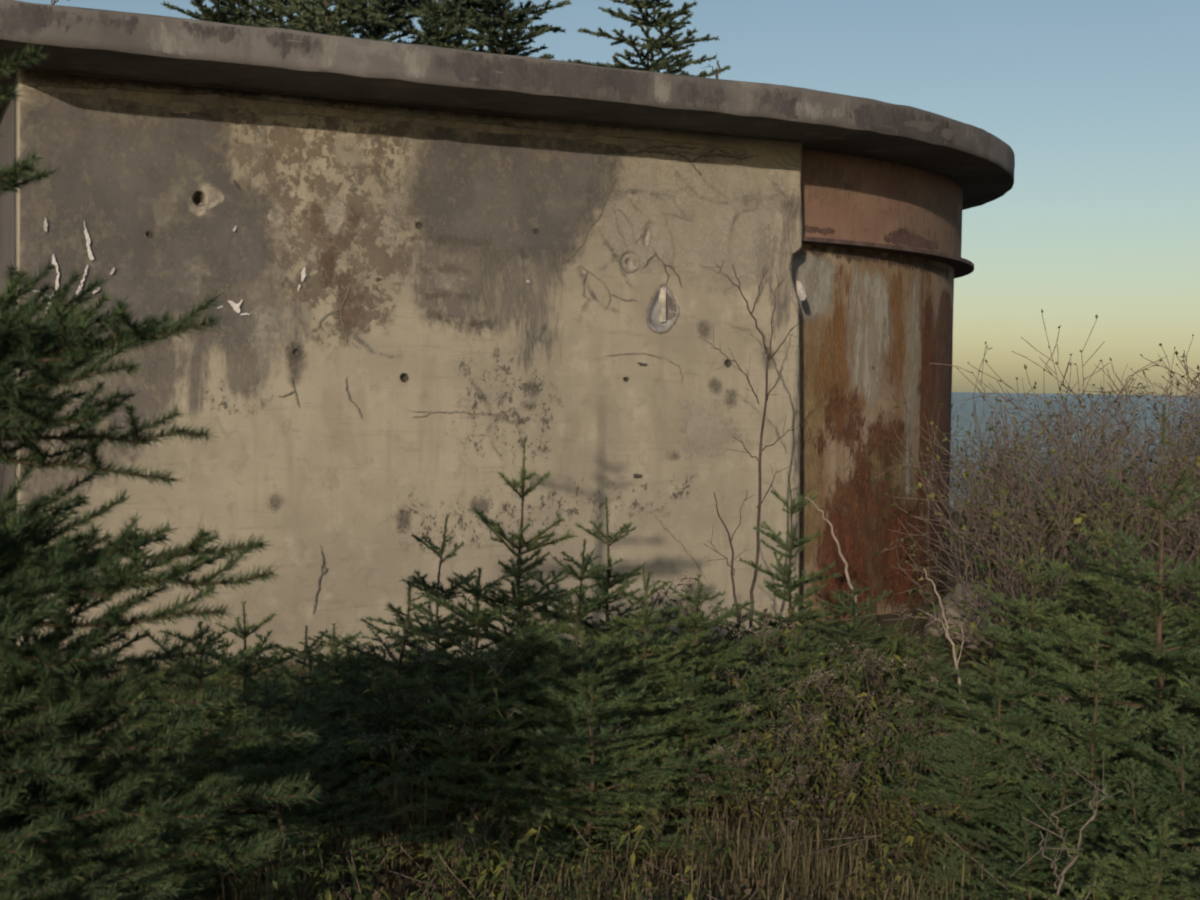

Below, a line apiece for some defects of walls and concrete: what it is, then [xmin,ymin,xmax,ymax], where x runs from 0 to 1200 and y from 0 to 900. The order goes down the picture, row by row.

spalling [189,177,241,217]
water stain [20,69,642,502]
rust [800,246,953,617]